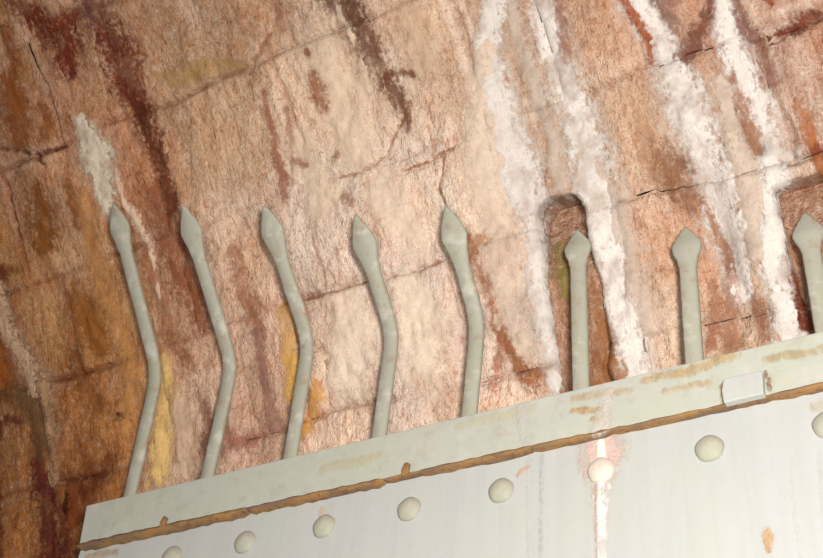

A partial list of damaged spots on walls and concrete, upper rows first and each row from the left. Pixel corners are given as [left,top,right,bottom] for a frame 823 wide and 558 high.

corrosion [620,0,654,64]
crack [746,20,823,46]
crack [23,145,68,166]
leakage [458,0,662,396]
leakage [616,0,823,343]
corrosion [223,265,283,447]
corrosion [30,370,823,558]
leakage [579,387,623,558]